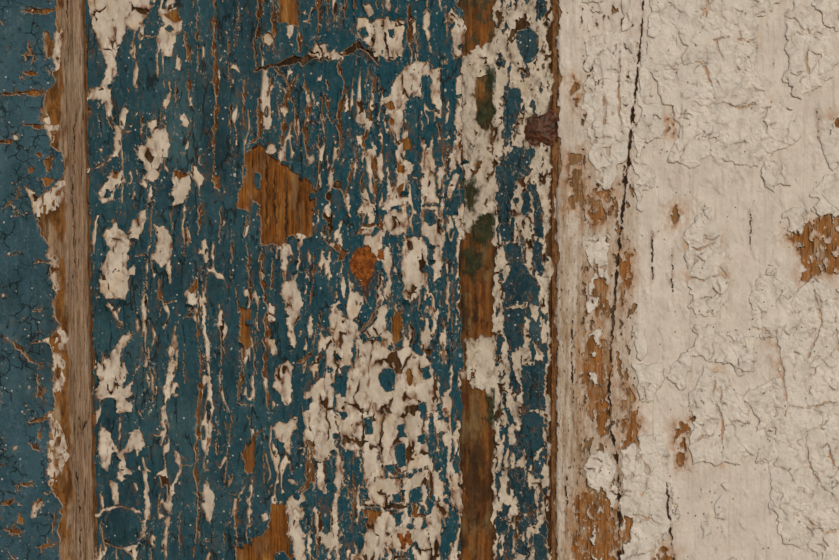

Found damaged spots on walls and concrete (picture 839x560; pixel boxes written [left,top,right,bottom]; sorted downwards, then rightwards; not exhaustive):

peeling [91,312,141,414]
peeling [87,0,183,203]
peeling [97,80,192,324]
crack [251,241,277,405]
crack [175,0,384,363]
corrosion [349,245,385,289]
peeling [234,0,549,560]
crack [376,0,450,52]
crack [419,113,446,242]
crack [607,1,644,560]
peeling [566,0,801,317]
peeling [571,118,839,560]